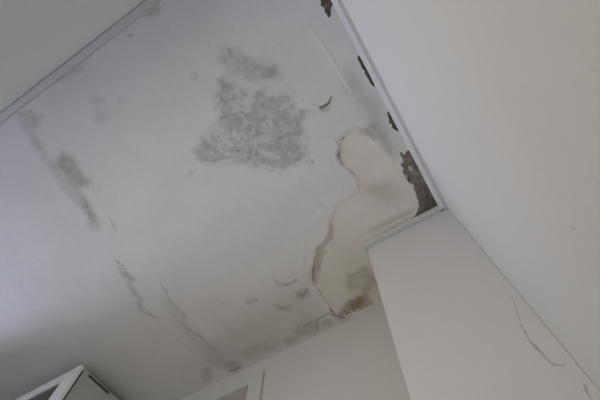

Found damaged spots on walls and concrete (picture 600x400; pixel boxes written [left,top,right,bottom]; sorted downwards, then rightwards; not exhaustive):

spalling [320,0,333,18]
spalling [357,55,375,87]
peeling [307,127,438,316]